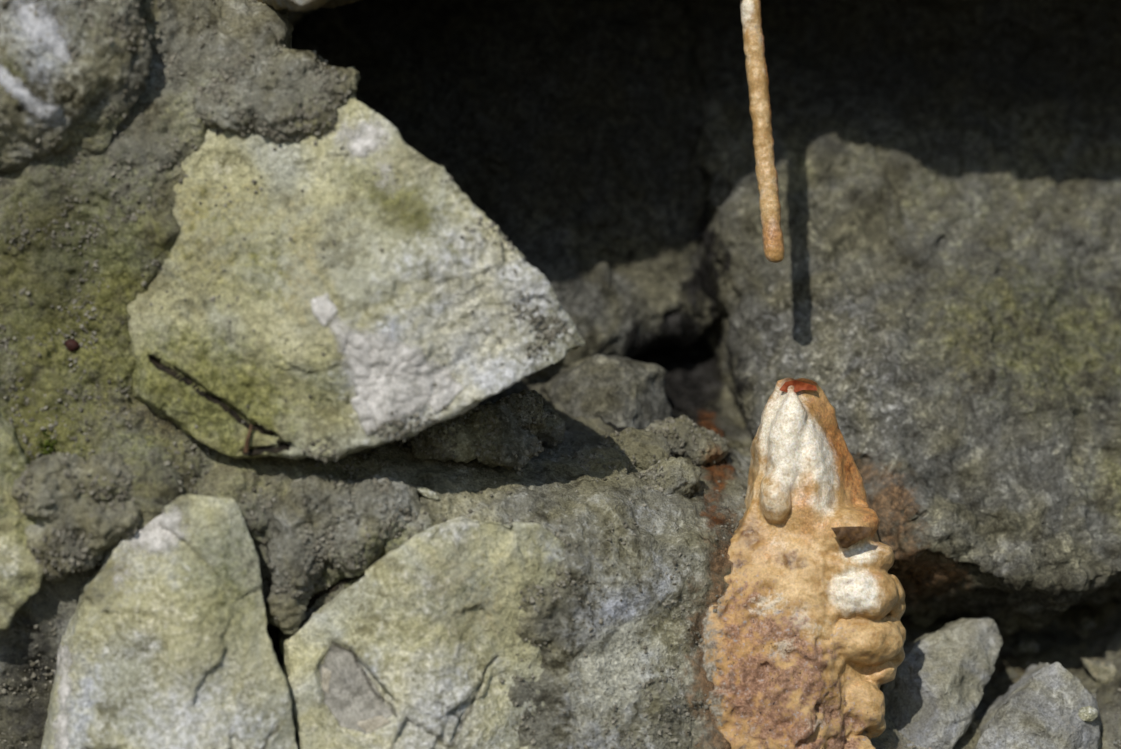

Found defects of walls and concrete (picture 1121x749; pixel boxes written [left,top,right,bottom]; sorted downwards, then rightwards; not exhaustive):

crack [149,356,290,456]